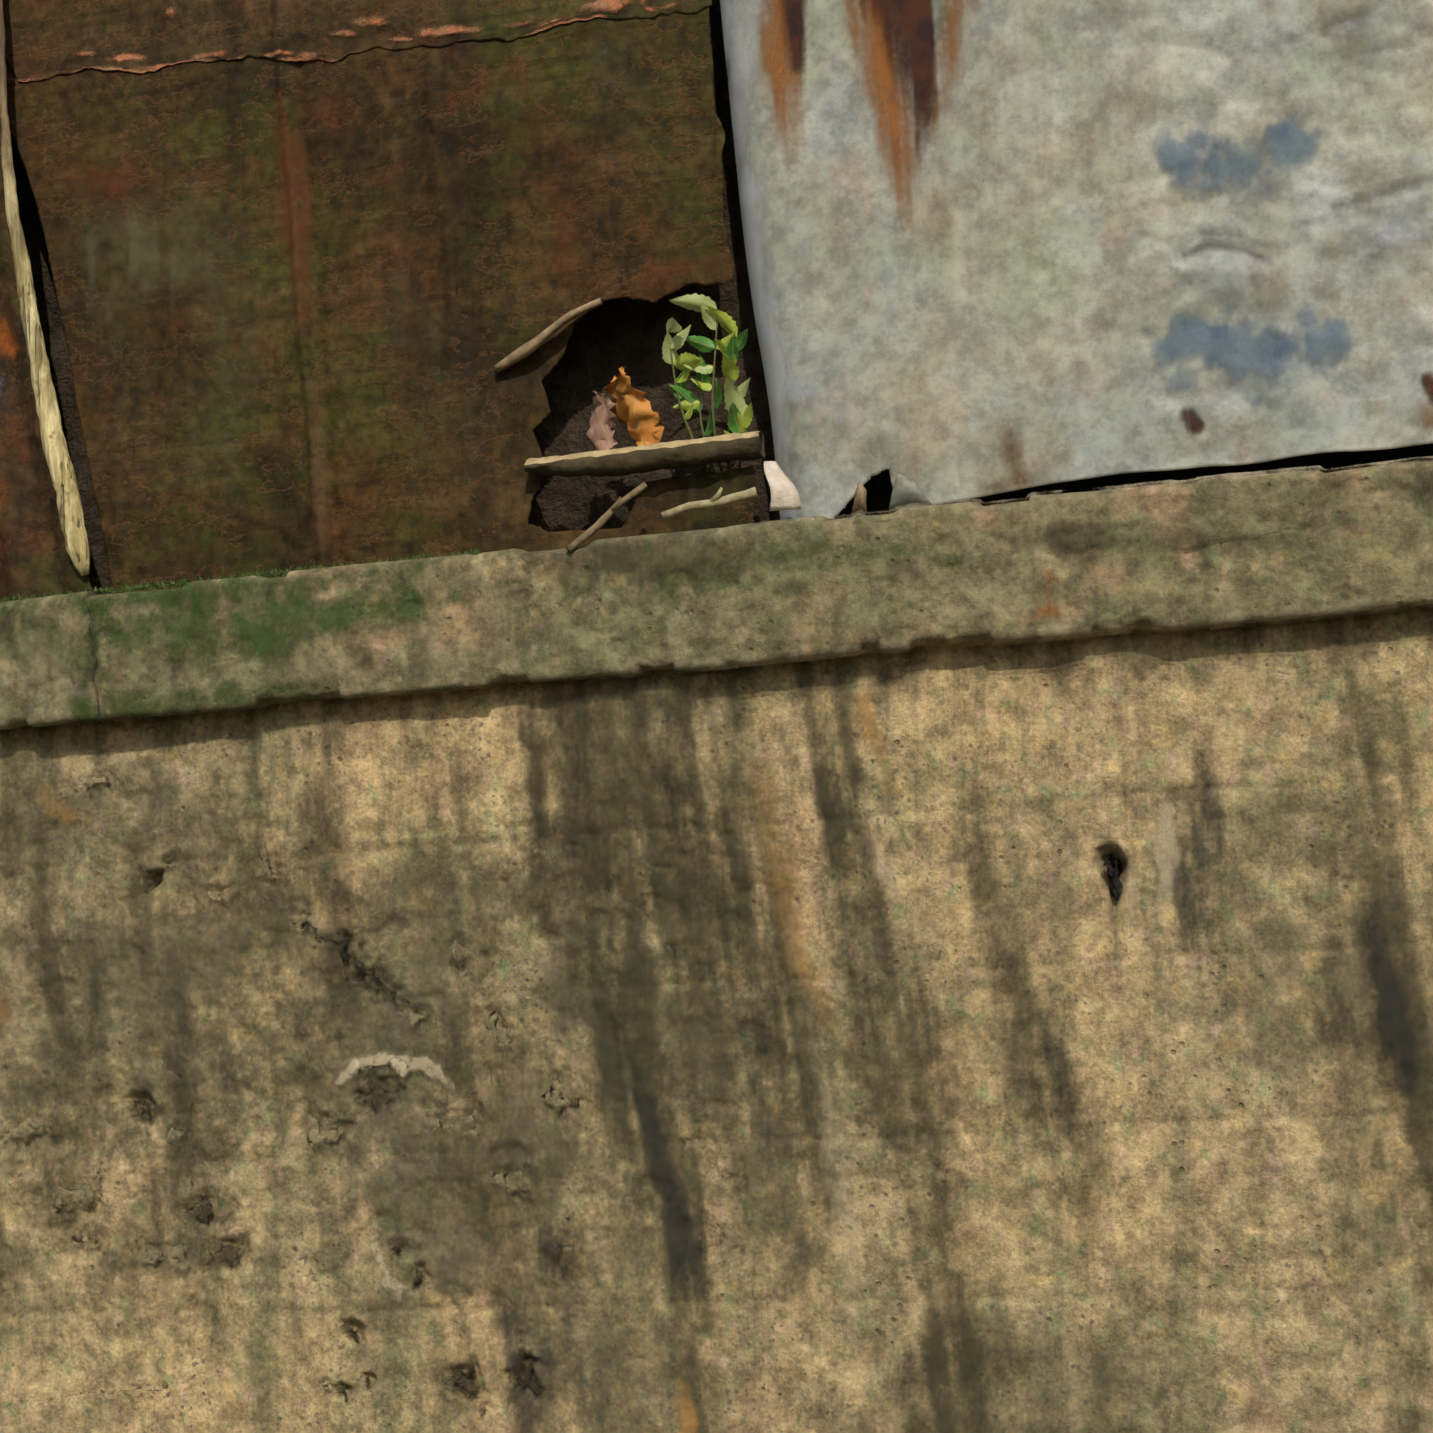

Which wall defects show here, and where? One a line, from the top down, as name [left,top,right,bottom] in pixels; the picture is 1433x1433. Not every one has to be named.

rust [762,0,804,128]
rust [848,0,961,193]
rust [1182,408,1204,432]
rust [1422,373,1433,401]
crack [260,897,428,1018]
water stain [580,704,711,1433]
water stain [1361,877,1433,1207]
spalling [138,1242,192,1270]
spalling [186,1195,212,1223]
spalling [446,1367,486,1412]